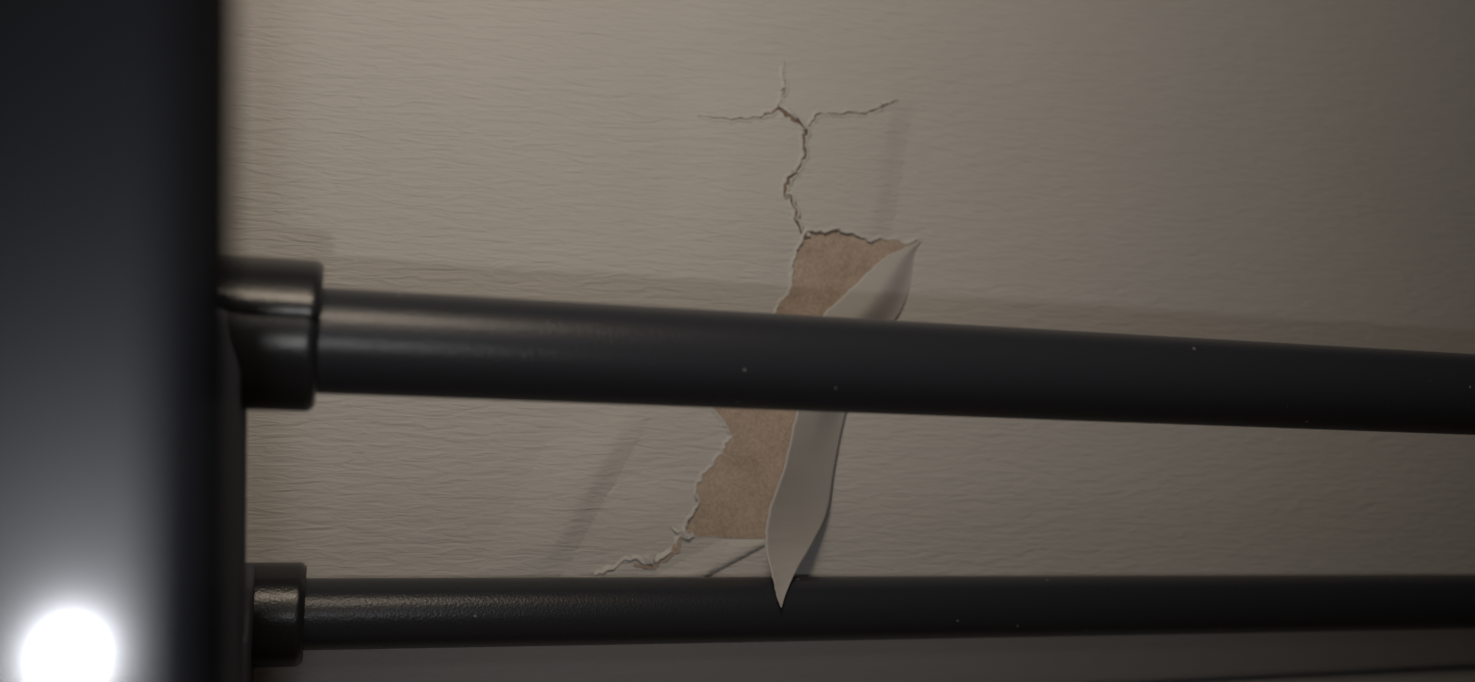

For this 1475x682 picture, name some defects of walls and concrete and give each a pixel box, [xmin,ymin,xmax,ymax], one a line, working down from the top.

crack [697,61,898,237]
peeling [773,225,922,320]
peeling [594,408,847,608]